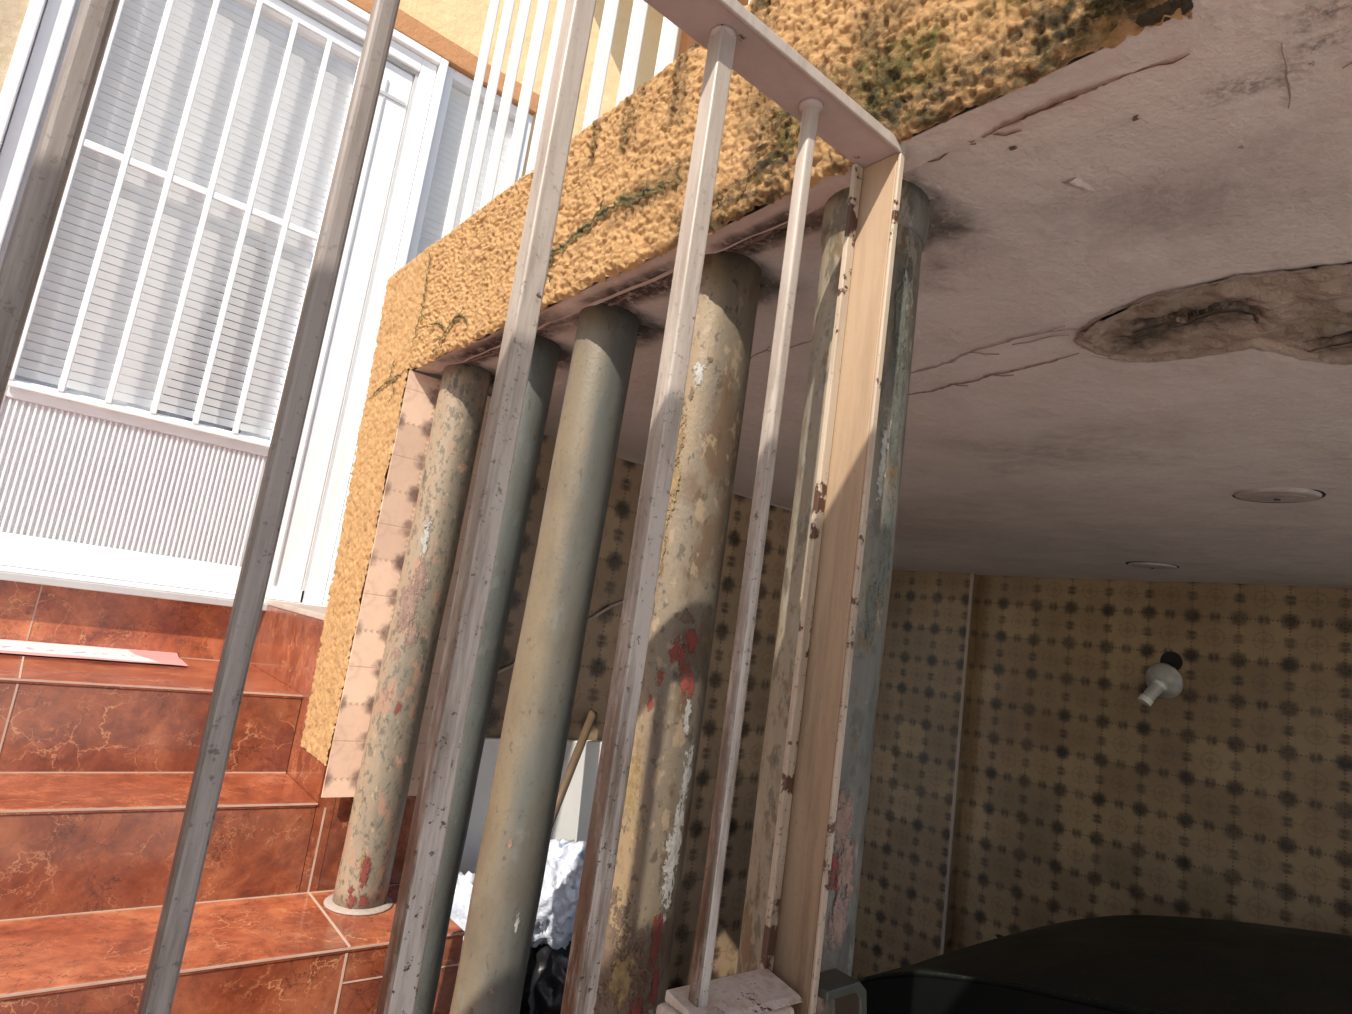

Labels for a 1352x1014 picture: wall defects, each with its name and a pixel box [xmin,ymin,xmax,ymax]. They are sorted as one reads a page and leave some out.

leakage [671,42,700,118]
crack [926,53,1190,163]
leakage [709,110,790,255]
leakage [458,336,503,386]
leakage [536,319,559,337]
leakage [591,271,673,339]
crack [909,326,1079,395]
spalling [1073,264,1352,365]
peeling [653,357,713,611]
peeling [594,610,700,1014]